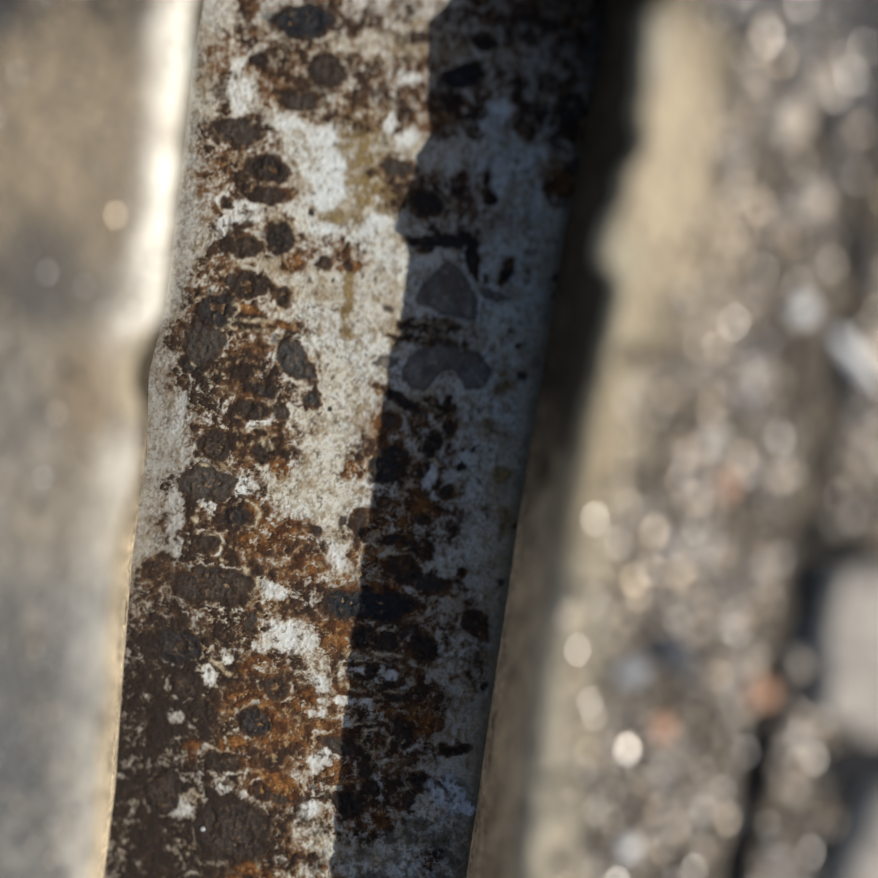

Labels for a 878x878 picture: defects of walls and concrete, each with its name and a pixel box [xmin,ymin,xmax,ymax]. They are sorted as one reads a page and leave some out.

rust [104,0,605,878]